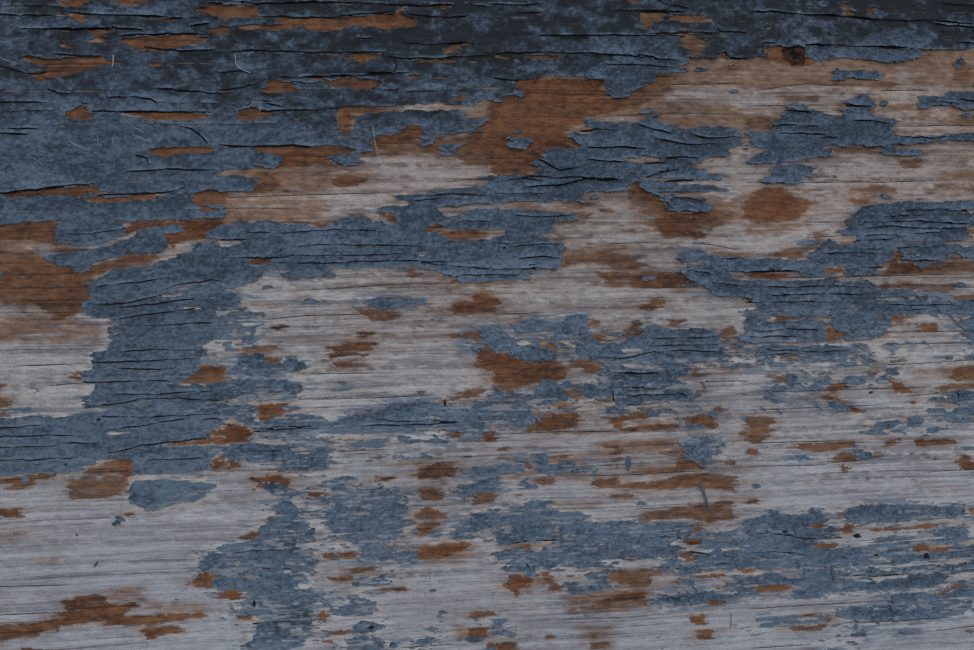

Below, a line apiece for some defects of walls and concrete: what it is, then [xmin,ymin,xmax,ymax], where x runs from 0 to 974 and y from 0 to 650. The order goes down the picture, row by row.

peeling [0,0,974,273]
crack [0,0,974,289]
crack [89,277,222,326]
crack [266,313,360,321]
peeling [0,92,974,482]
crack [603,208,974,410]
crack [0,349,229,461]
peeling [126,479,217,511]
crack [254,426,317,452]
peeling [192,475,449,650]
crack [298,395,459,426]
peeling [450,497,974,650]